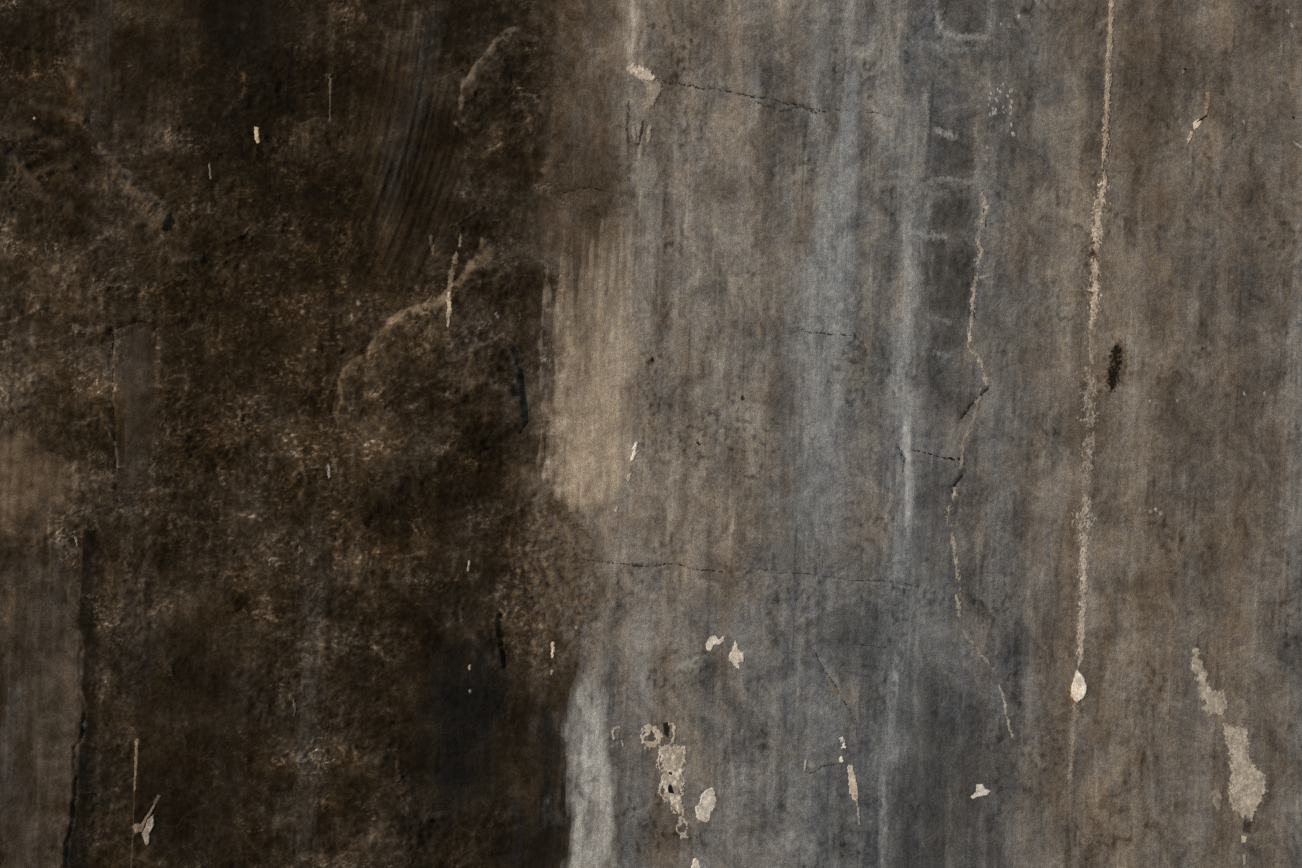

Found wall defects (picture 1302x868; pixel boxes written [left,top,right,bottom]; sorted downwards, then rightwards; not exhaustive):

crack [657,78,895,119]
crack [801,329,868,357]
leakage [1059,0,1152,669]
leakage [781,0,1083,868]
crack [896,191,1015,739]
crack [582,559,923,590]
crack [811,645,856,721]
flaking render [640,720,717,840]
flaking render [1191,647,1269,865]